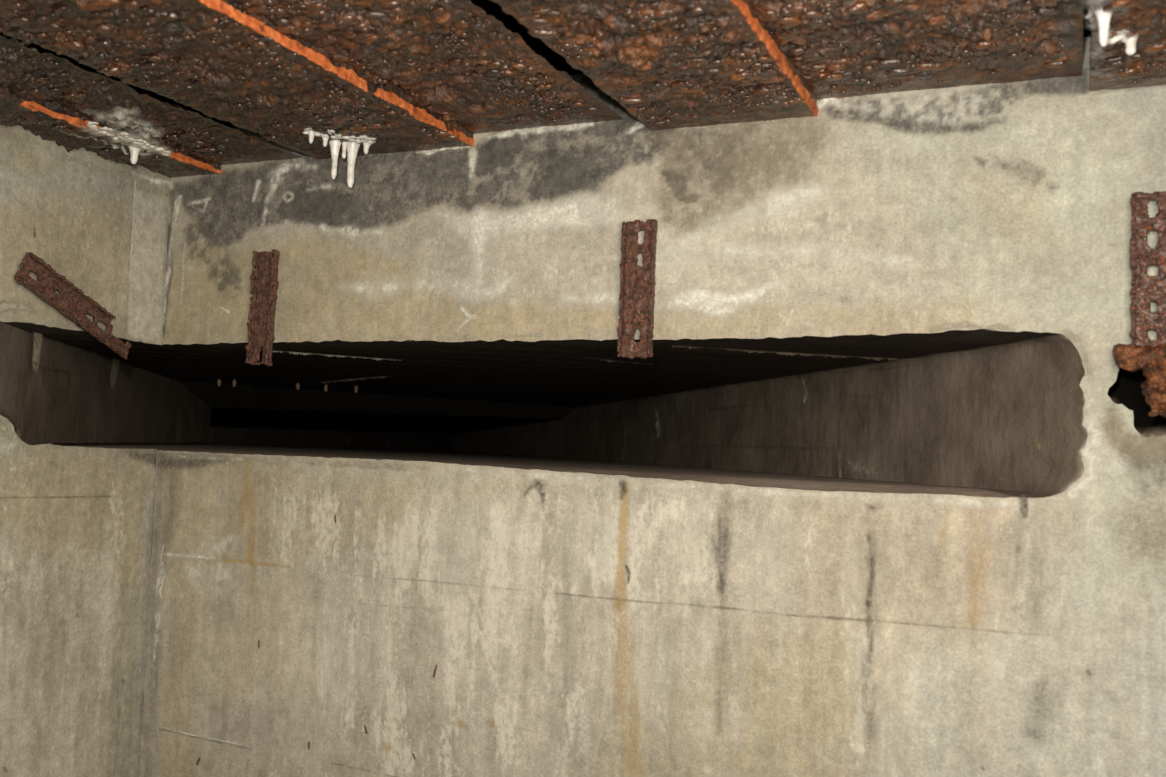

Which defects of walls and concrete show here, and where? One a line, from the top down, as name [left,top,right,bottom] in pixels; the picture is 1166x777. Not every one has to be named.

corrosion [0,0,487,147]
corrosion [428,58,560,97]
corrosion [503,0,608,66]
corrosion [632,0,946,117]
water stain [831,0,1139,132]
corrosion [1102,0,1137,29]
corrosion [1090,37,1166,81]
water stain [65,108,171,164]
corrosion [86,123,241,174]
water stain [163,74,821,332]
spalling [1107,368,1166,438]
corrosion [619,481,627,598]